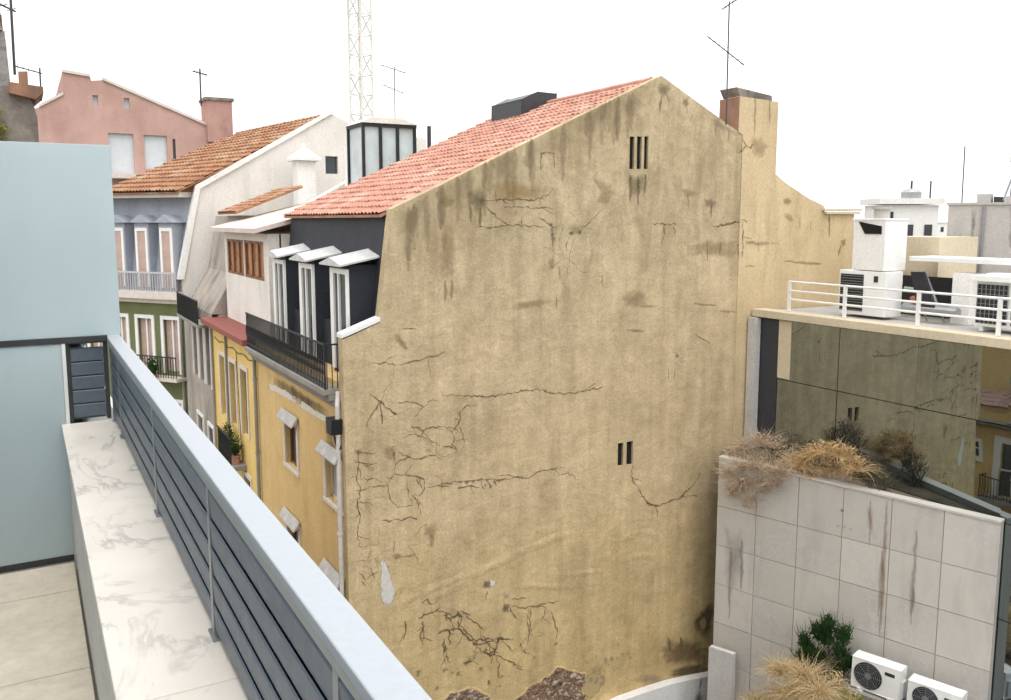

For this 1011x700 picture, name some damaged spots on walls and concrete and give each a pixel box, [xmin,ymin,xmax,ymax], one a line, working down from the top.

crack [478,191,596,249]
crack [377,351,445,376]
crack [353,384,602,586]
crack [631,466,698,515]
peeling [380,560,395,606]
crack [399,591,558,677]